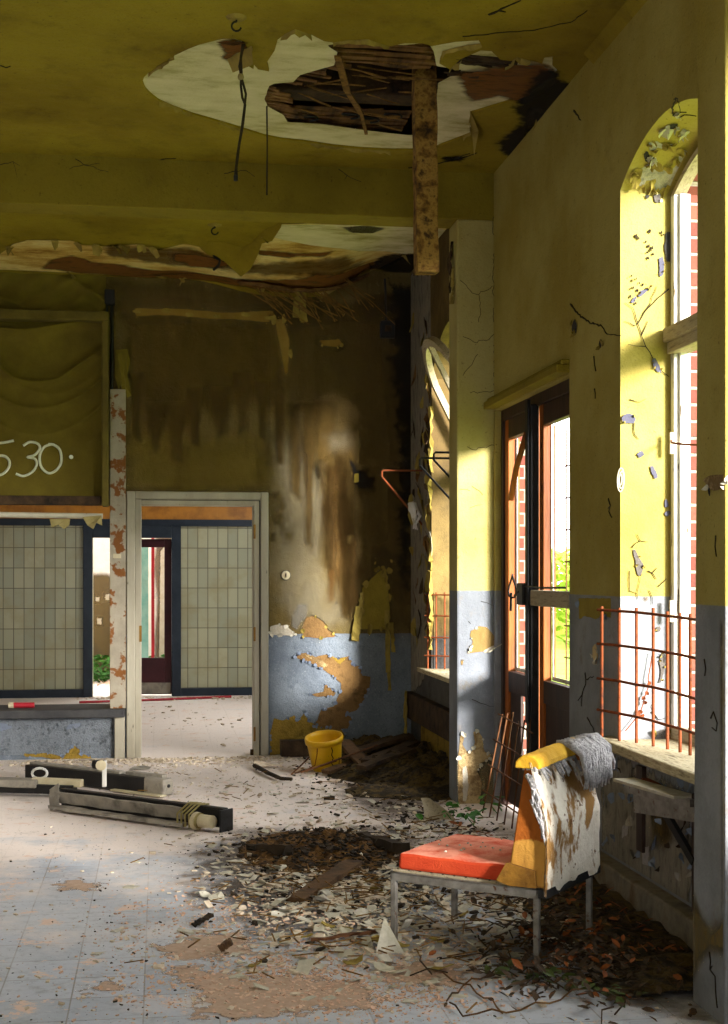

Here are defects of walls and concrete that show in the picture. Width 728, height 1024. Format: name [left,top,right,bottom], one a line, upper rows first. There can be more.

peeling [143,29,557,156]
peeling [630,113,690,203]
crack [570,287,669,377]
peeling [0,222,434,734]
leakage [119,283,411,631]
spalling [617,467,625,492]
peeling [622,413,636,423]
spalling [633,549,645,576]
peeling [461,626,502,665]
peeling [269,651,370,755]
spalling [329,726,492,848]
peeling [169,832,575,1004]